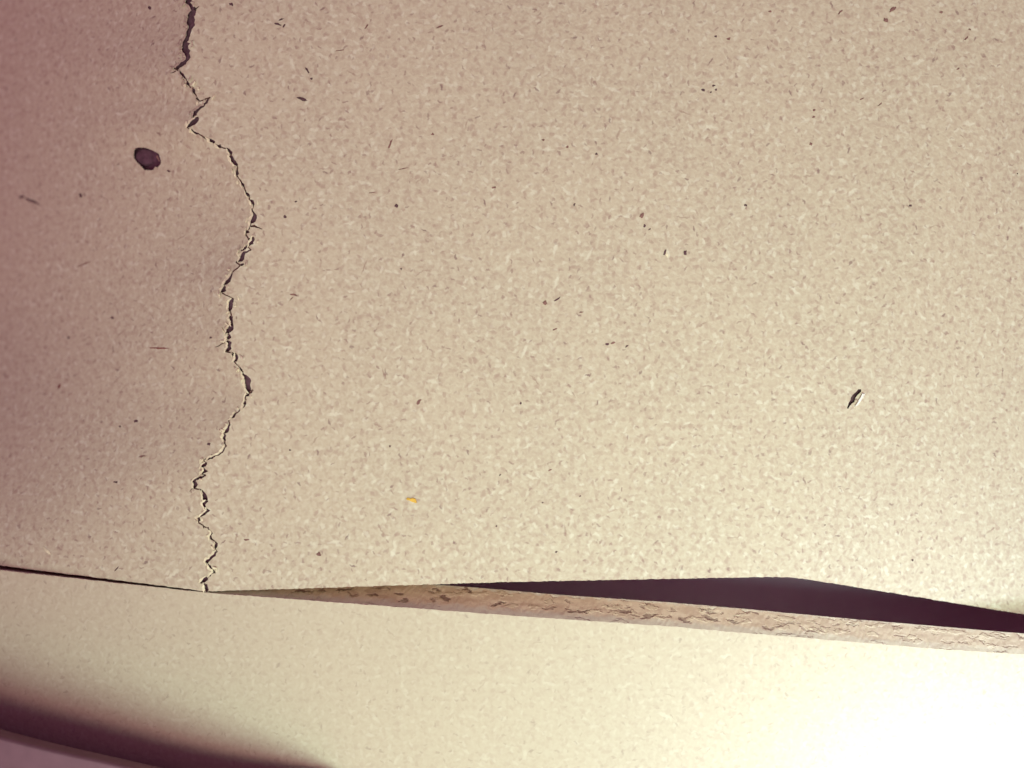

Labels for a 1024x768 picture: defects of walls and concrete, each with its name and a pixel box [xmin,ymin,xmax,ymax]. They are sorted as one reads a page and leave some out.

crack [170,0,261,592]